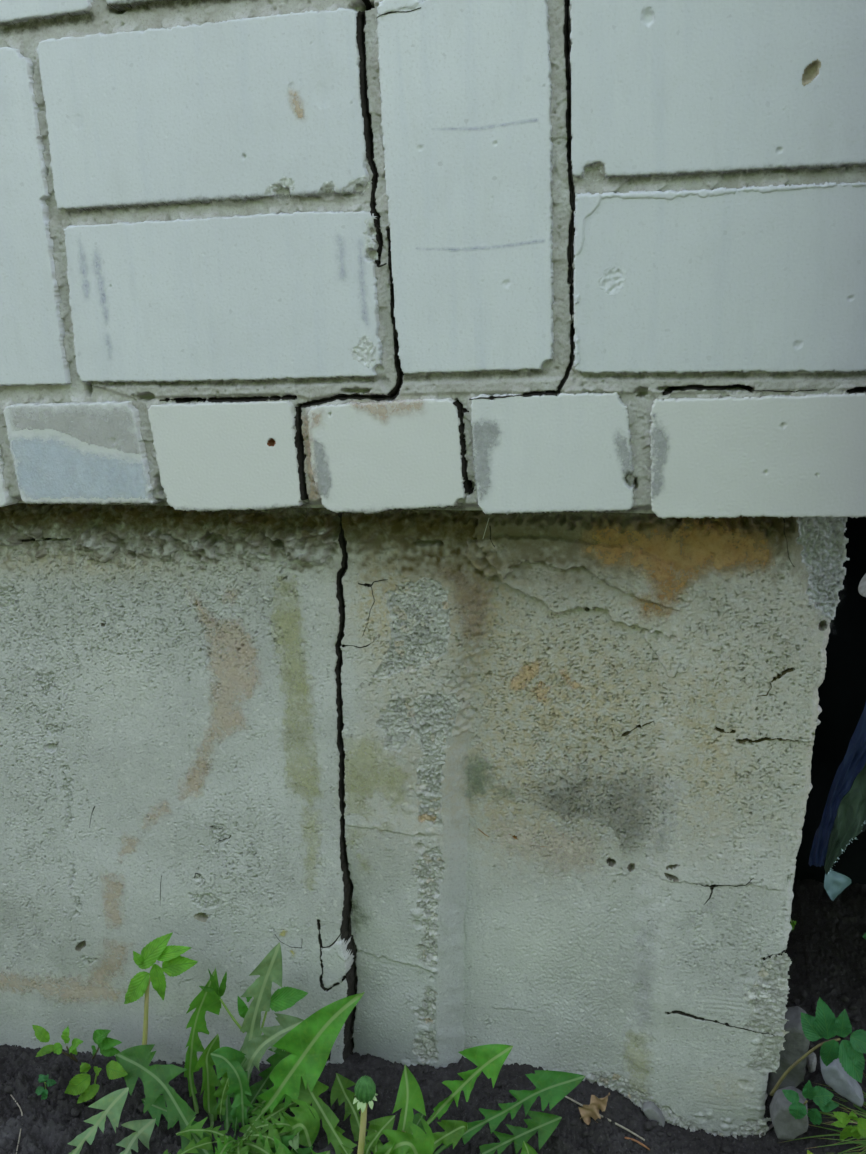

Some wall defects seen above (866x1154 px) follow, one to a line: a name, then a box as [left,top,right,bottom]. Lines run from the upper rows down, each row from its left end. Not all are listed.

crack [160,0,421,500]
crack [453,0,576,494]
rust [582,519,770,614]
spalling [371,577,452,679]
crack [275,512,388,1061]
spalling [376,691,460,828]
spalling [411,846,447,967]
crack [693,878,754,904]
spalling [411,986,440,1064]
crack [667,1010,773,1035]